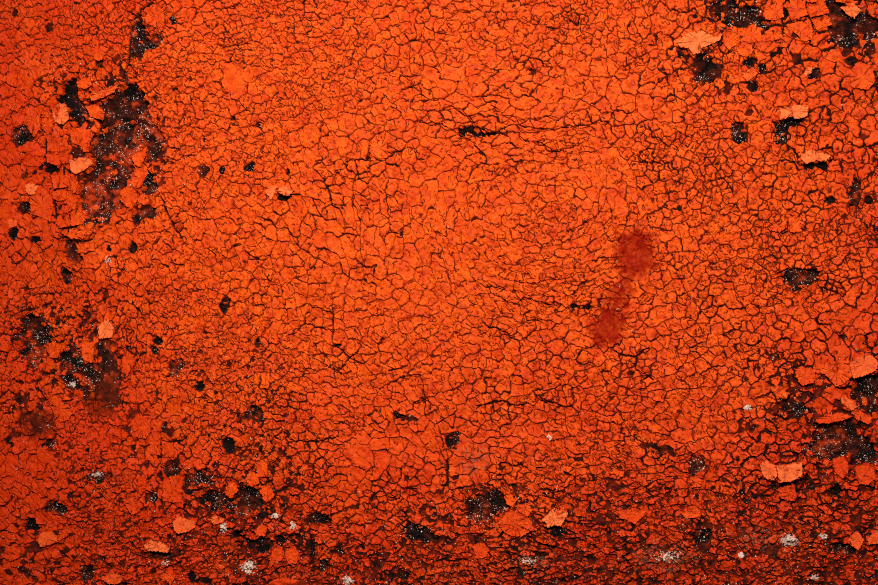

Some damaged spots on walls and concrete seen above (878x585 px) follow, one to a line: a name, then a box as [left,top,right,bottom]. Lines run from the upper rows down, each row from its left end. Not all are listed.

spalling [676,0,878,92]
crack [828,0,878,22]
crack [0,149,33,184]
crack [57,163,72,175]
spalling [7,77,166,285]
crack [83,120,104,145]
crack [448,234,488,263]
spalling [16,313,134,410]
spalling [760,355,878,501]
crack [836,375,878,460]
spalling [122,419,275,524]
spalling [466,486,568,559]